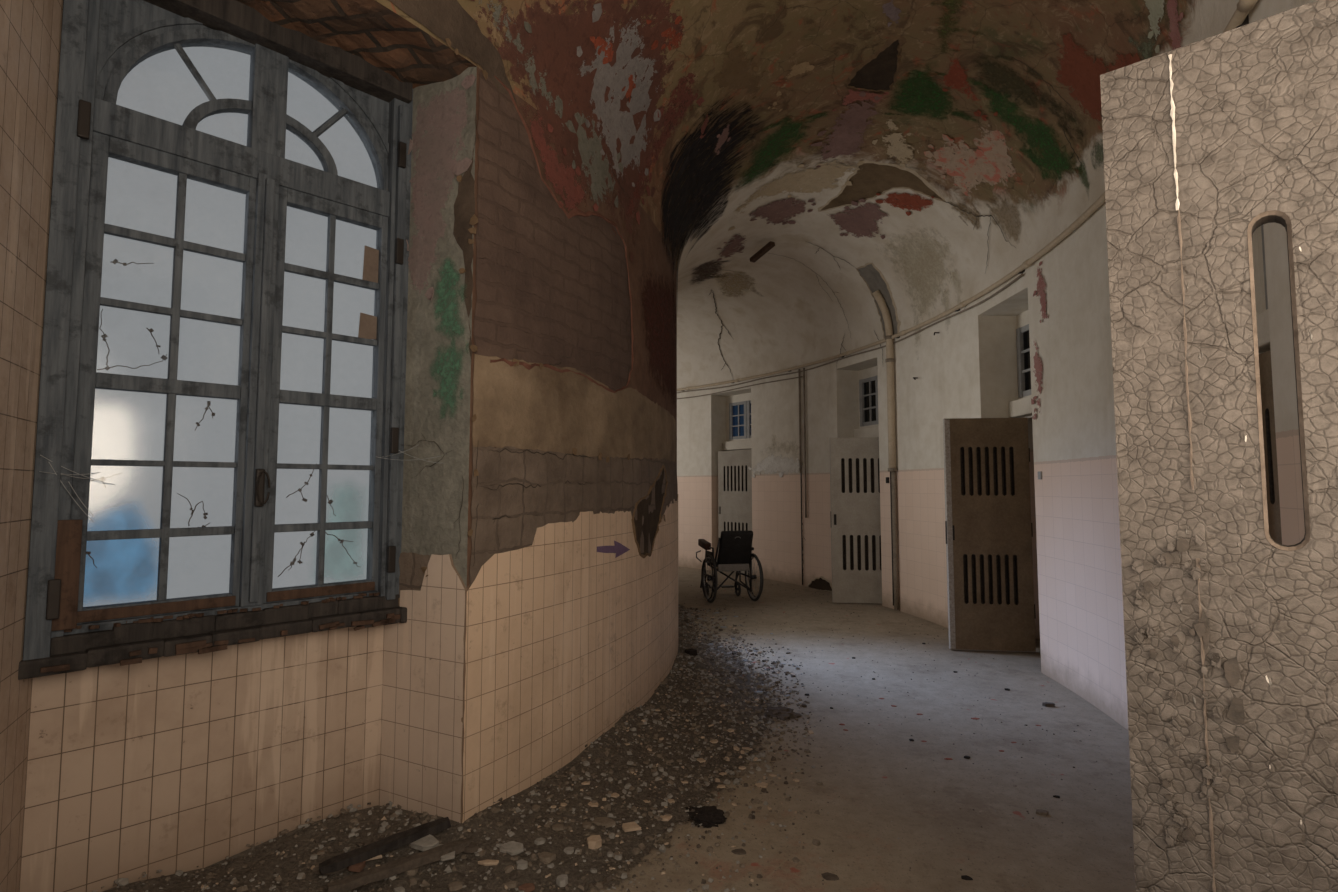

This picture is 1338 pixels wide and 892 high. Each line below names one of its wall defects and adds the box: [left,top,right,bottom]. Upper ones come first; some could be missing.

peeling [1144,0,1183,53]
flaking render [832,35,907,111]
peeling [1055,33,1141,122]
peeling [389,0,685,263]
peeling [700,114,731,155]
peeling [717,119,1017,261]
flaking render [453,113,678,586]
crack [709,291,732,374]
flaking render [856,263,901,338]
peeling [1031,341,1043,420]
peeling [1033,261,1048,323]
flaking render [807,576,832,592]